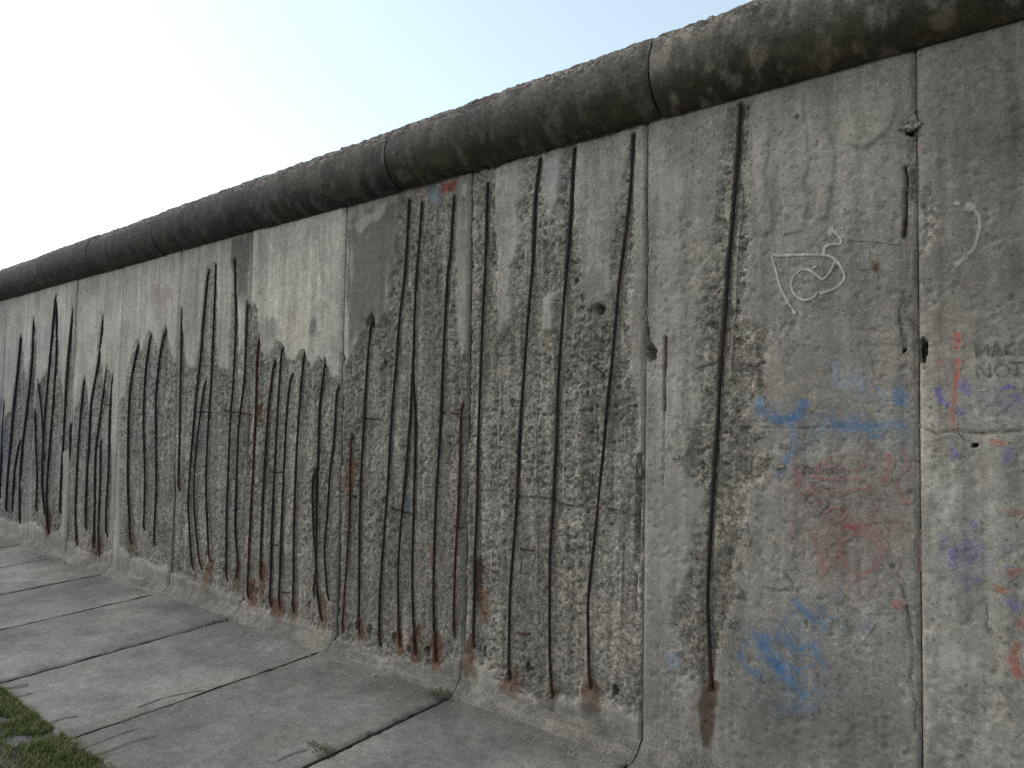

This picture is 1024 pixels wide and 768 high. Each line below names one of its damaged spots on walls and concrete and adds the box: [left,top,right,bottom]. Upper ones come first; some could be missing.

water stain [652,155,688,439]
water stain [727,193,744,379]
spalling [0,122,648,720]
spalling [669,99,792,689]
corrosion [245,557,300,627]
corrosion [393,618,445,672]
corrosion [461,553,492,683]
corrosion [496,664,526,695]
water stain [645,461,711,627]
corrosion [695,676,721,762]